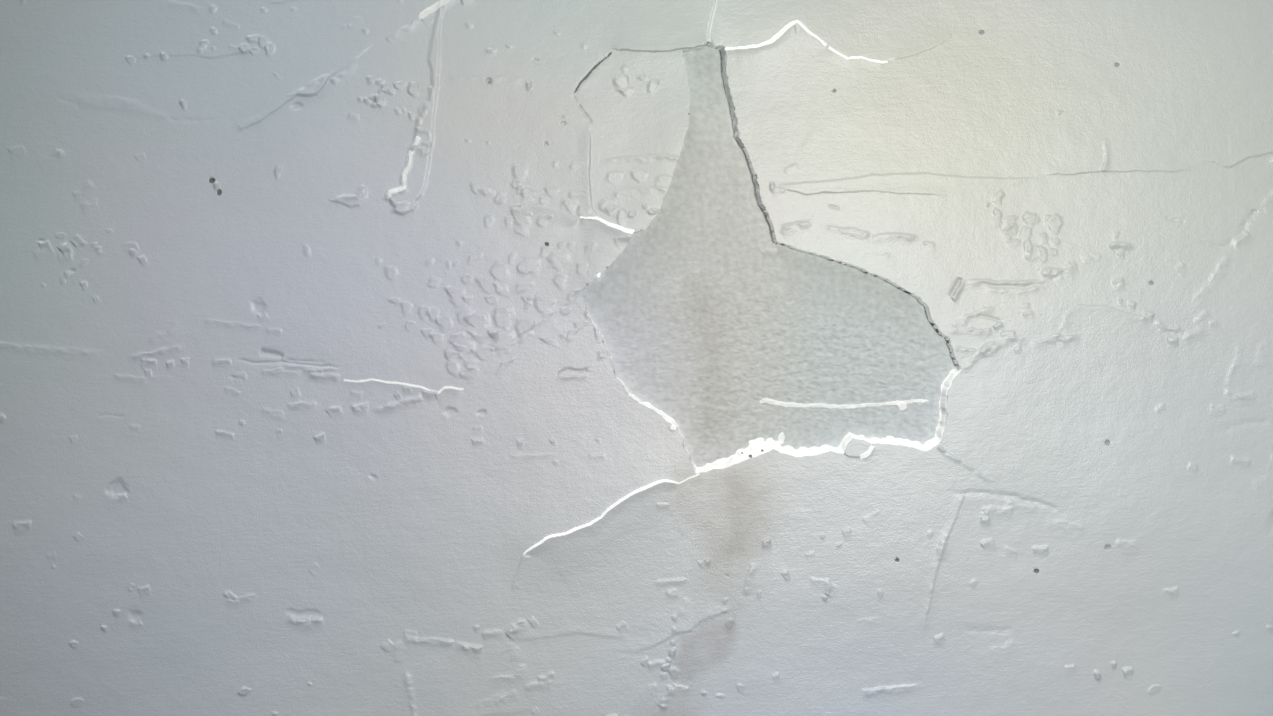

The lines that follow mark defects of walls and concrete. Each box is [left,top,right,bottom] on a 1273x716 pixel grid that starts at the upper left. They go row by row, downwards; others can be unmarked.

crack [509,0,957,234]
peeling [582,41,962,473]
spalling [948,277,965,301]
crack [1202,152,1273,169]